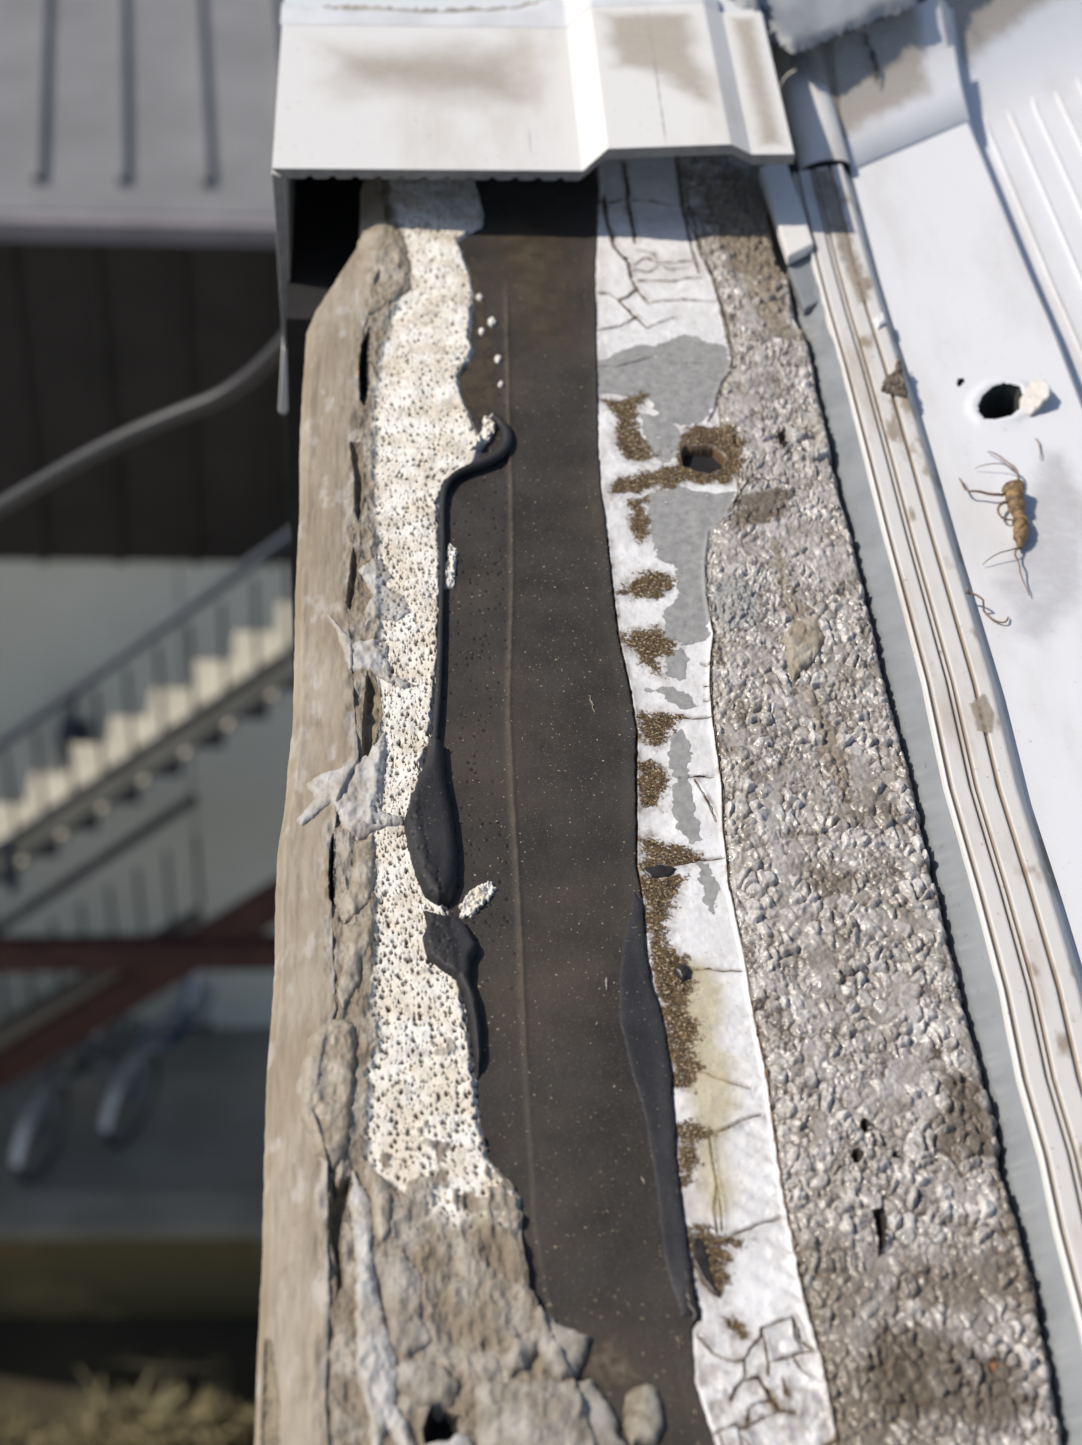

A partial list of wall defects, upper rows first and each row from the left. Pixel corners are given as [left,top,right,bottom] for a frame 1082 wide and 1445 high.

damp [616,16,696,87]
crack [595,158,734,419]
peeling [644,485,759,709]
peeling [667,729,702,844]
peeling [696,861,720,915]
crack [698,1264,841,1445]